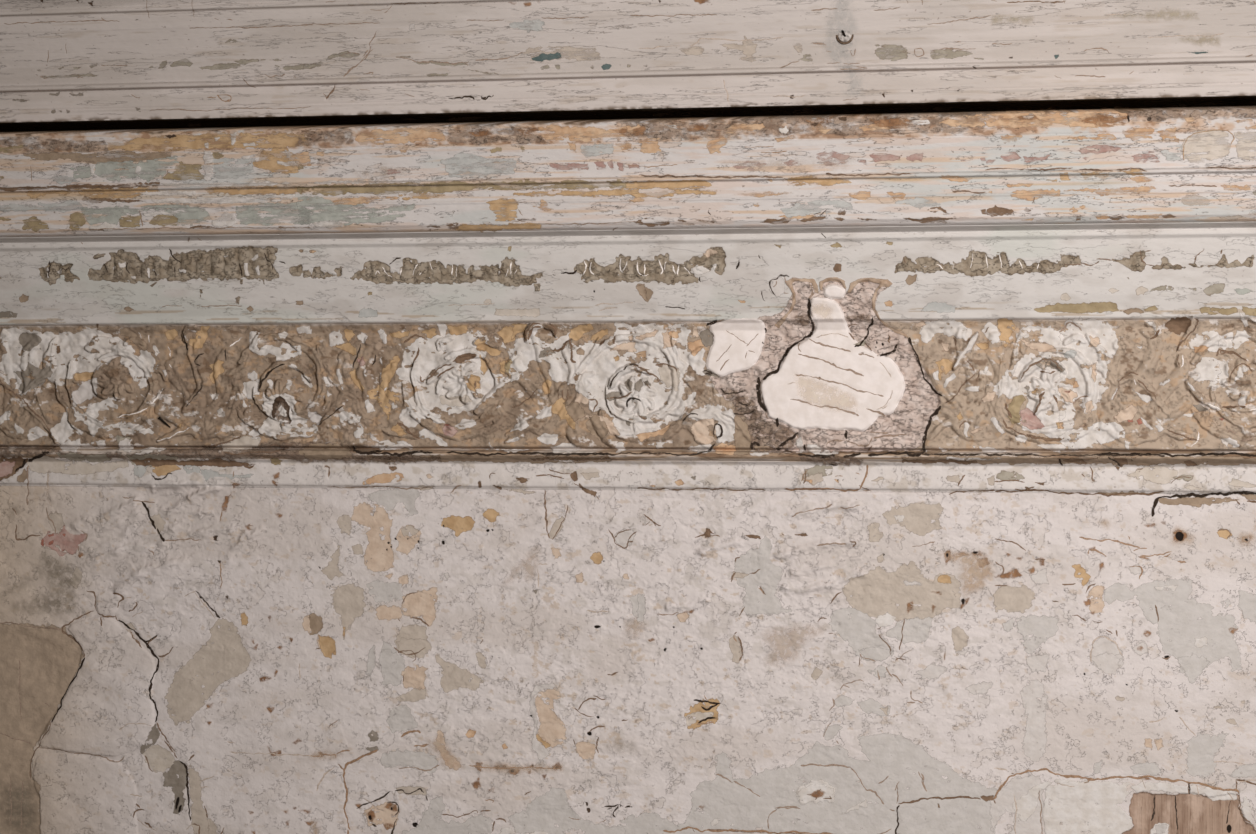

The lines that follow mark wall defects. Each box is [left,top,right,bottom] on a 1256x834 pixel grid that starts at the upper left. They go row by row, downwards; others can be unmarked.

peeling [0,104,1256,318]
crack [750,284,1256,579]
peeling [867,250,1256,542]
crack [185,591,220,618]
peeling [0,294,884,773]
crack [695,528,808,539]
flaking render [0,622,84,834]
crack [30,611,175,812]
crack [130,791,156,831]
spalling [140,724,224,834]
peeling [620,706,1256,834]
crack [801,647,1256,834]